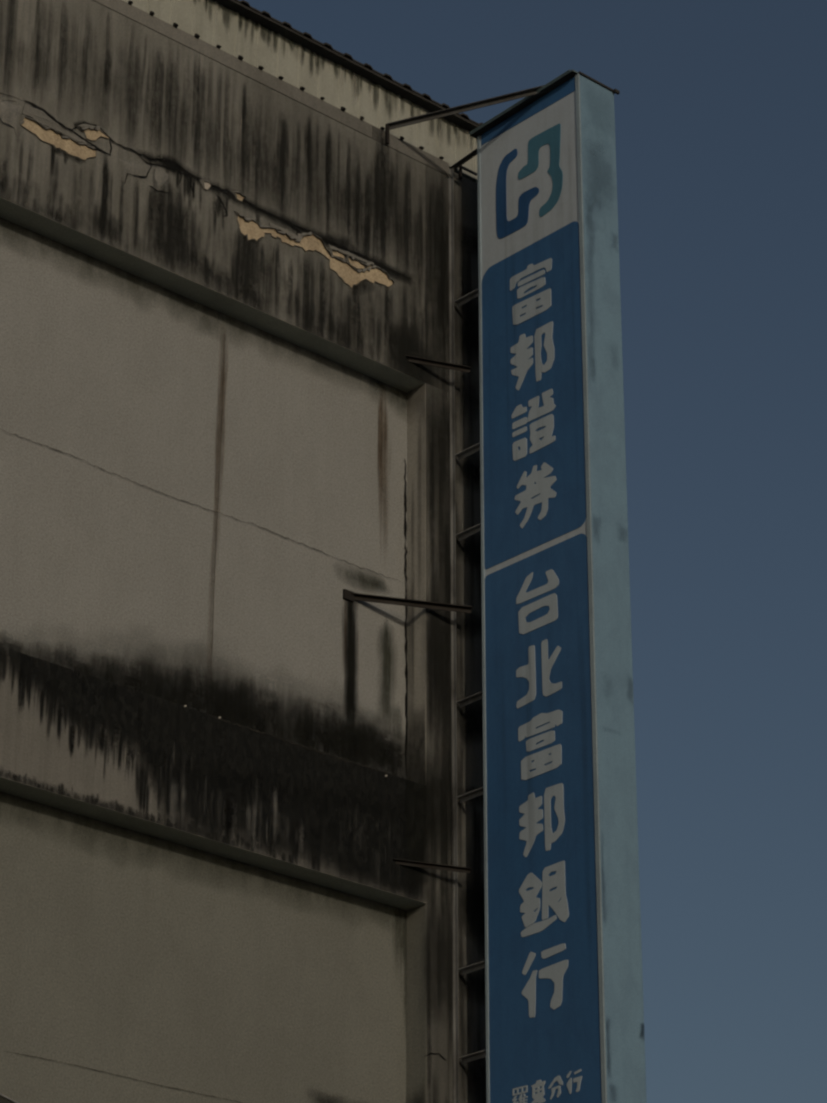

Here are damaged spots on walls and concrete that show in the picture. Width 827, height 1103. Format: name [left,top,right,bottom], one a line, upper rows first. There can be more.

peeling [19,104,110,161]
damp [97,165,123,234]
crack [0,93,410,279]
damp [144,136,445,325]
peeling [231,191,395,288]
damp [461,303,479,356]
crack [14,379,408,775]
damp [430,429,481,600]
damp [429,615,483,741]
damp [0,601,454,910]
damp [461,885,485,943]
crack [4,1051,242,1103]